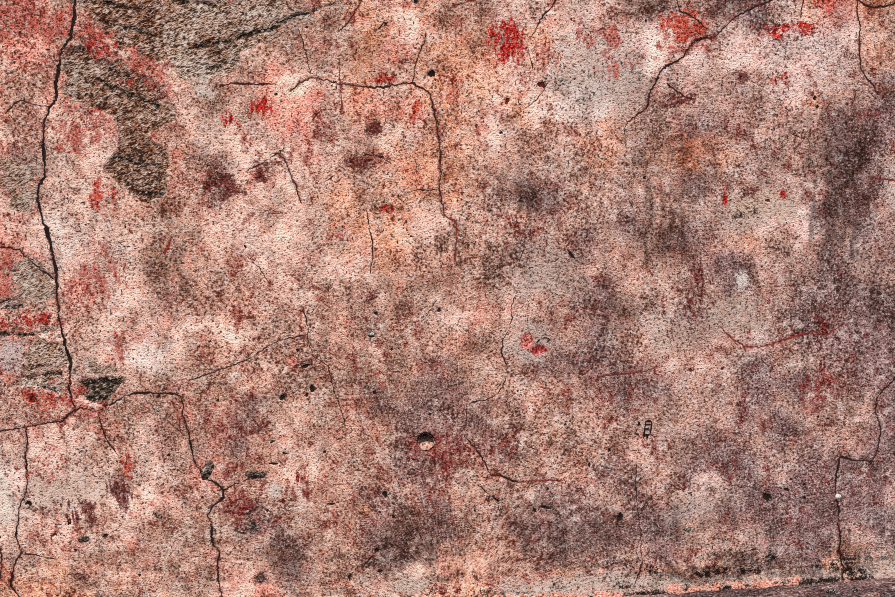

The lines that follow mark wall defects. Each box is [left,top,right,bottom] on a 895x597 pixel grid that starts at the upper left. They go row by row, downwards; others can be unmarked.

crack [219,1,458,260]
crack [624,0,772,146]
crack [856,0,895,94]
crack [0,0,345,597]
crack [365,210,373,273]
crack [834,377,895,581]